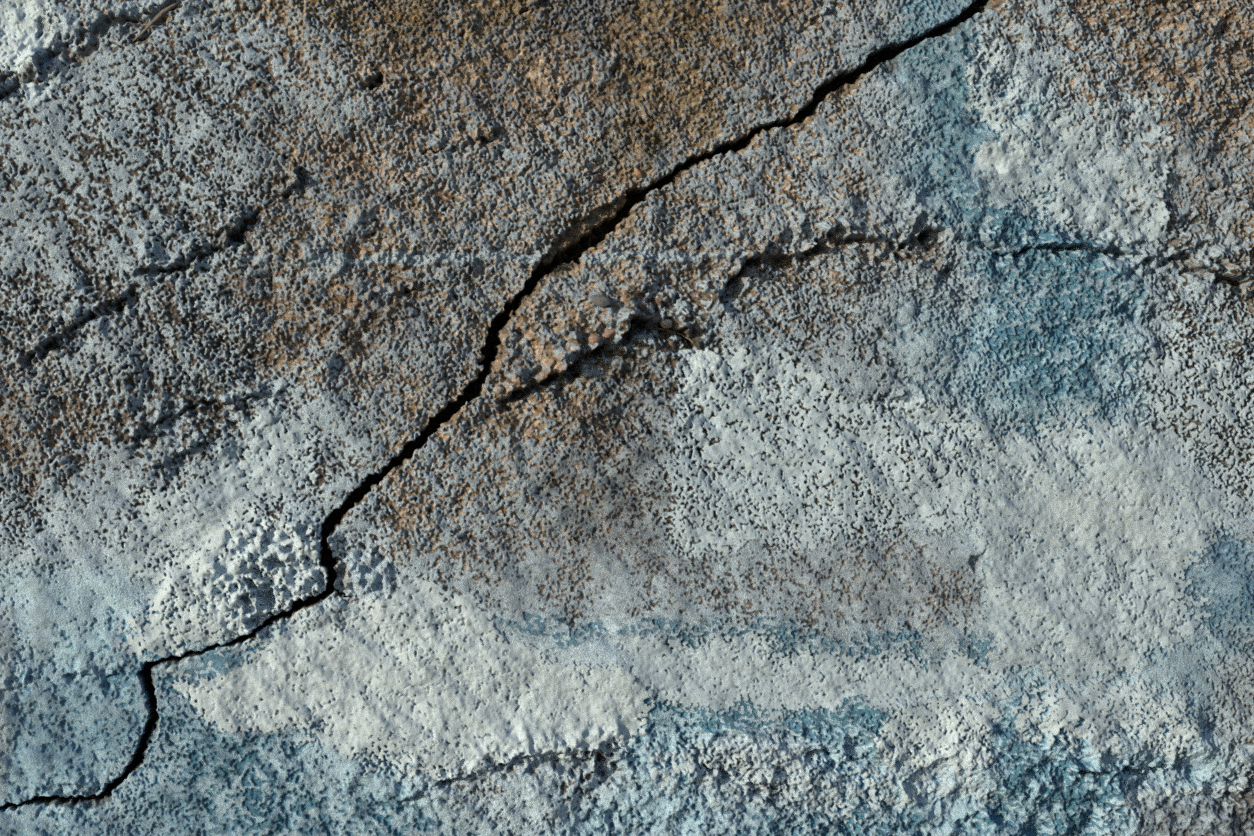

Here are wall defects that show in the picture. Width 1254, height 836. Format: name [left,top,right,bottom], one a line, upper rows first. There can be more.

crack [0,0,1007,817]